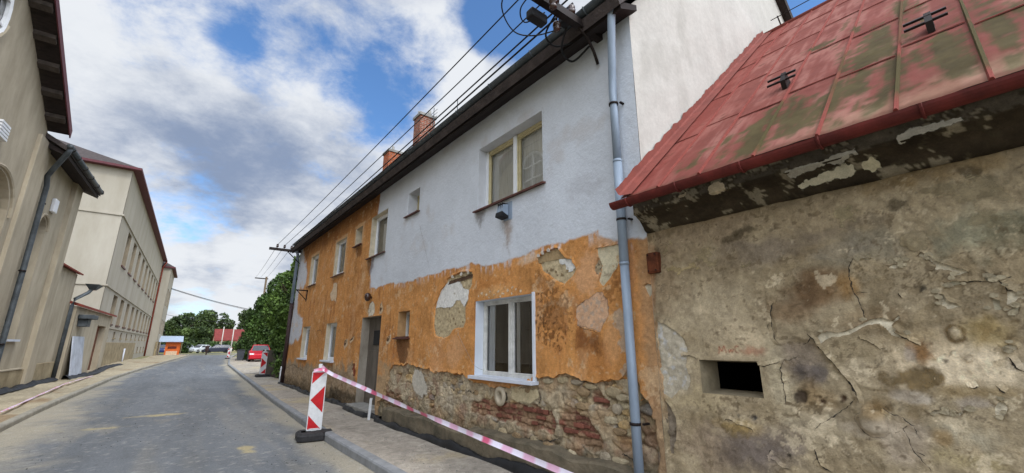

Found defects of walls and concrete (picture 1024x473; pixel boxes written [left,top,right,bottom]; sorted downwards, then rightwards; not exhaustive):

peeling [896,117,963,144]
peeling [708,181,725,195]
peeling [785,148,881,189]
spalling [434,269,522,338]
spalling [536,245,578,284]
peeling [575,242,619,333]
crack [843,257,923,349]
crack [960,276,1016,291]
spalling [376,317,693,473]
crack [757,301,931,473]
water stain [878,368,945,390]
crack [965,355,1024,393]